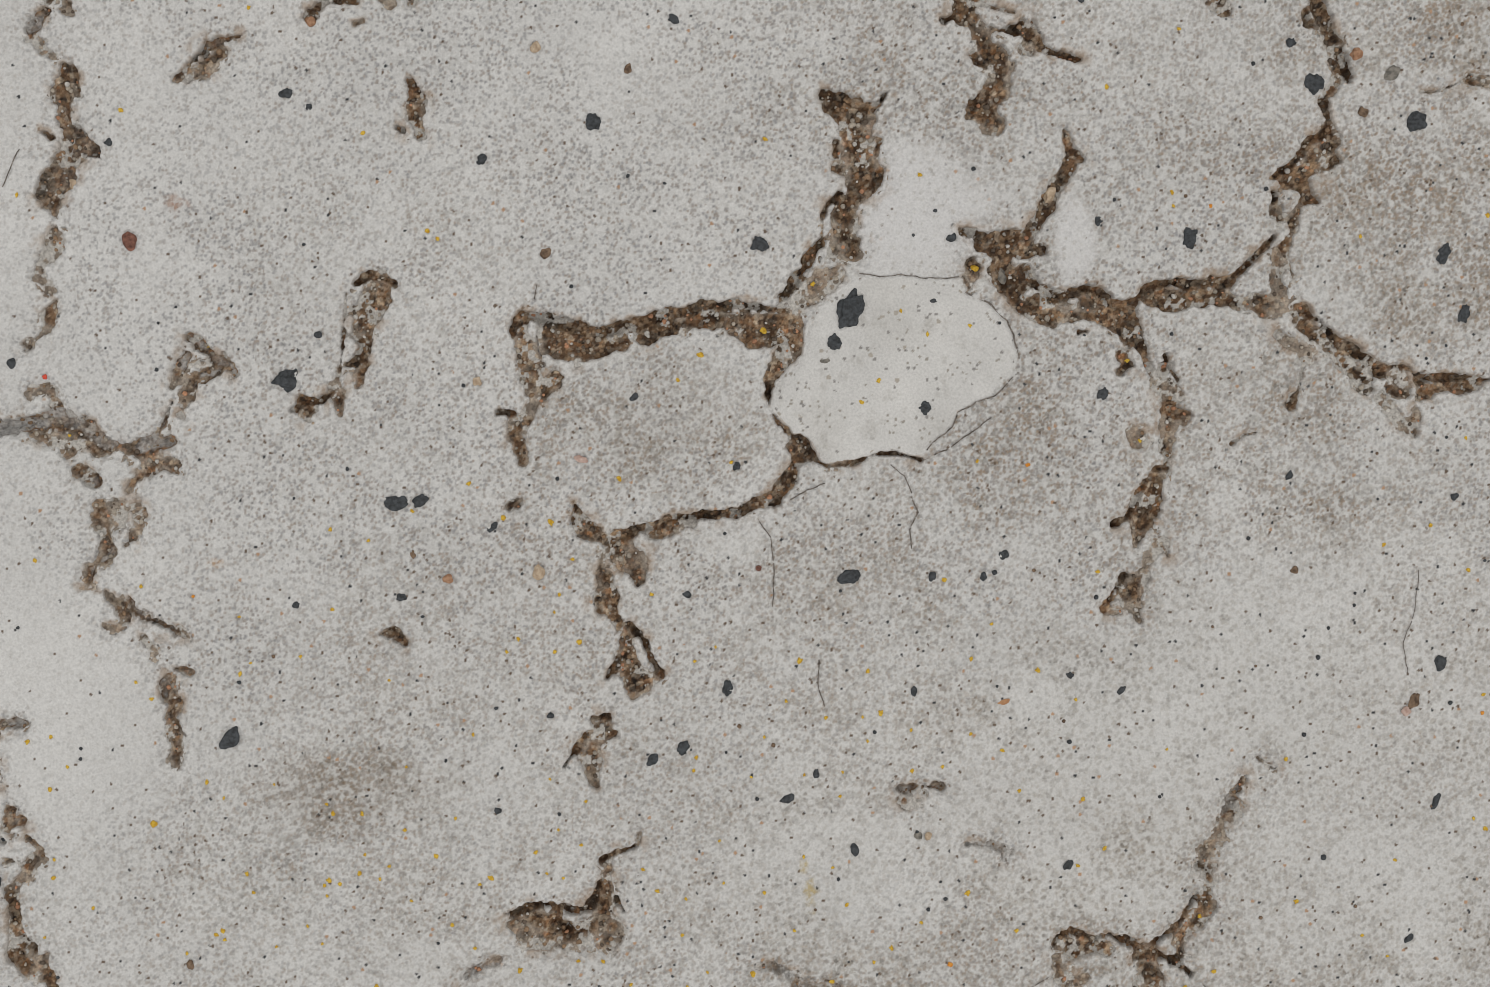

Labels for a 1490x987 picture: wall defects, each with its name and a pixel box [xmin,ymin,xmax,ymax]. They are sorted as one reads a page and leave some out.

crack [304,0,419,27]
crack [0,0,240,770]
crack [291,268,398,424]
peeling [772,278,1015,463]
crack [495,0,1490,788]
crack [0,773,59,987]
crack [464,956,505,981]
crack [755,961,841,987]
crack [1035,756,1279,987]